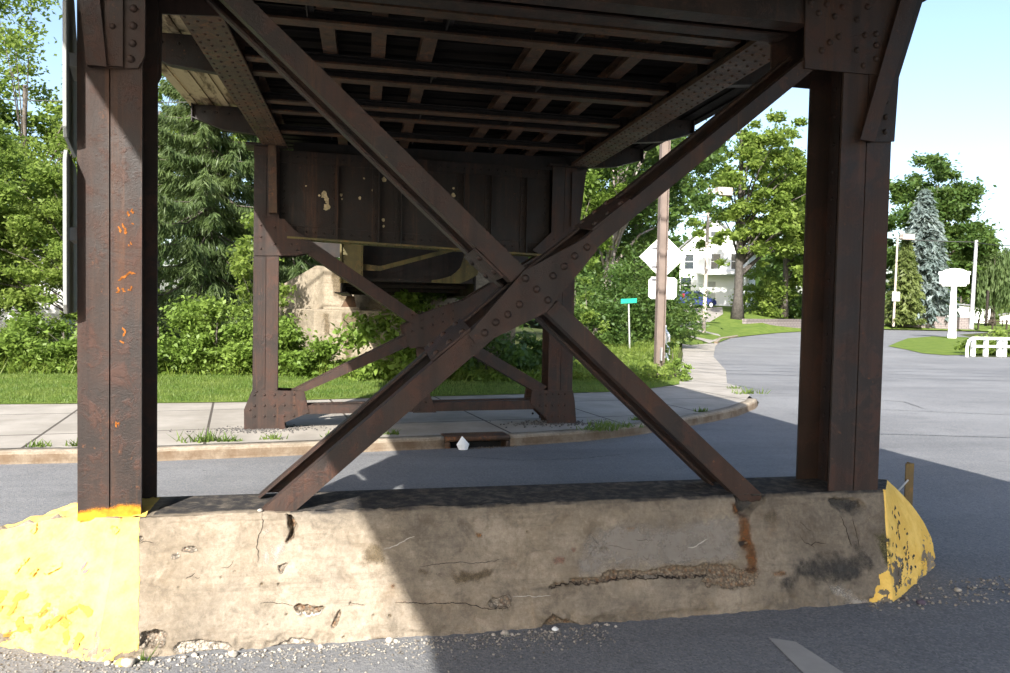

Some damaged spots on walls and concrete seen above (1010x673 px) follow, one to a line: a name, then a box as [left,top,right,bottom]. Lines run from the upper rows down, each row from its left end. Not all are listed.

peeling [318,191,343,210]
spalling [285,514,297,542]
corrosion [733,503,757,573]
peeling [885,506,916,585]
peeling [0,589,93,650]
spalling [285,603,324,617]
spalling [139,629,231,653]